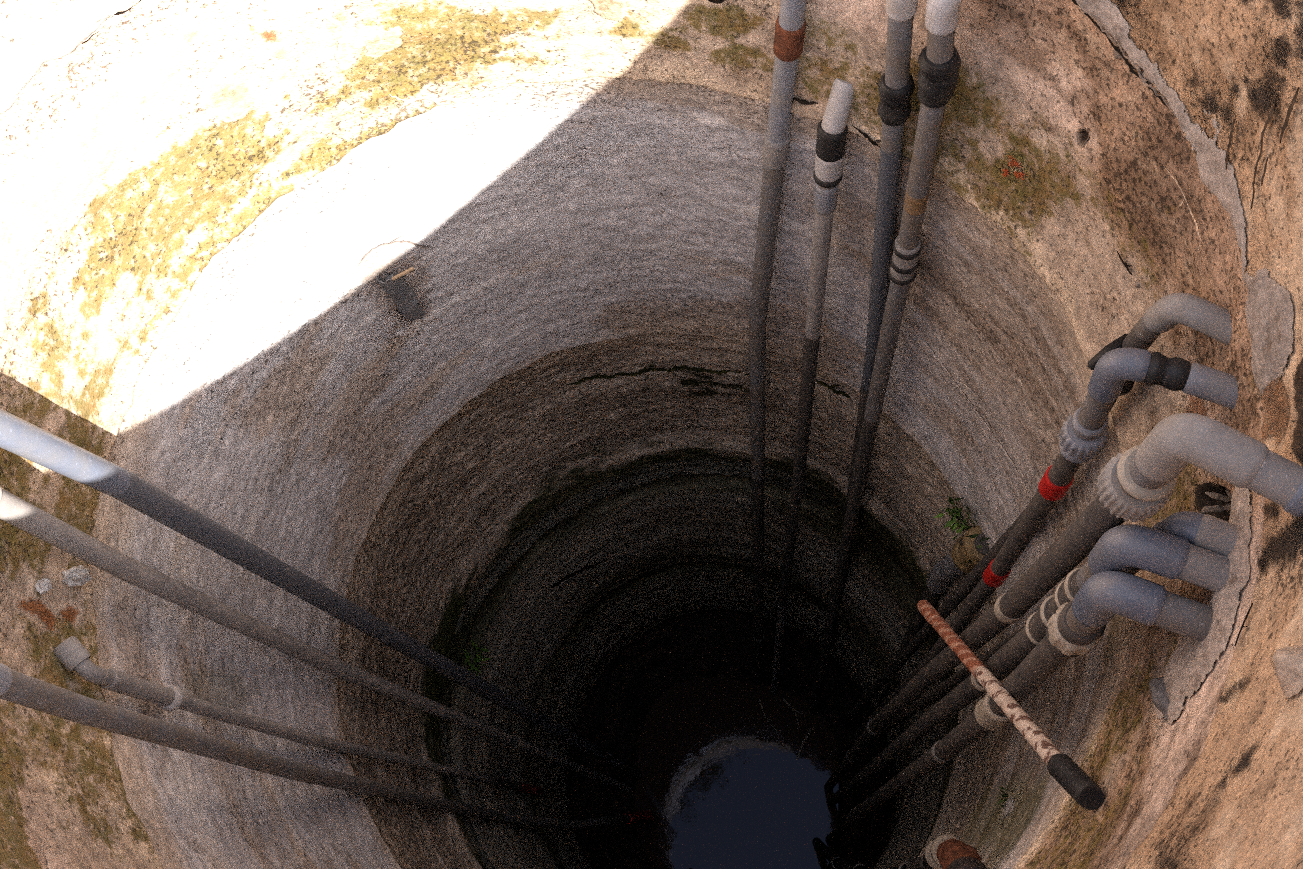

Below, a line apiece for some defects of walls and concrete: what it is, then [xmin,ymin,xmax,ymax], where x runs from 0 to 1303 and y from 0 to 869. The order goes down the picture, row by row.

crack [82,0,141,44]
crack [1071,0,1175,116]
spalling [1077,130,1089,148]
crack [566,365,768,386]
spalling [1261,358,1303,466]